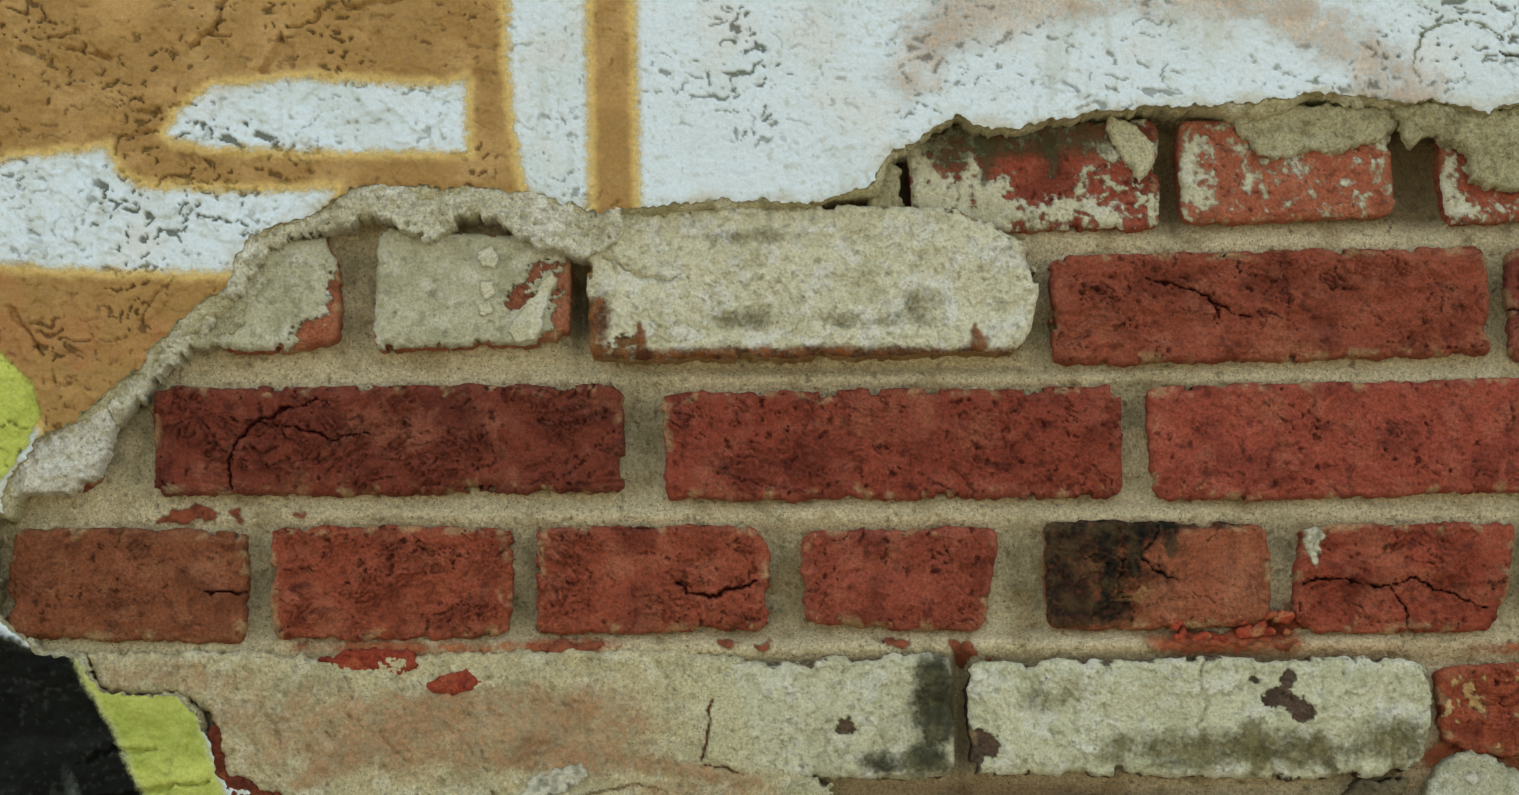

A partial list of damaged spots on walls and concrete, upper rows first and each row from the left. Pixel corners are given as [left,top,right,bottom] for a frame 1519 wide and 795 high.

peeling [61,93,1407,433]
peeling [1439,146,1519,224]
spalling [0,477,282,795]
peeling [717,638,1486,795]